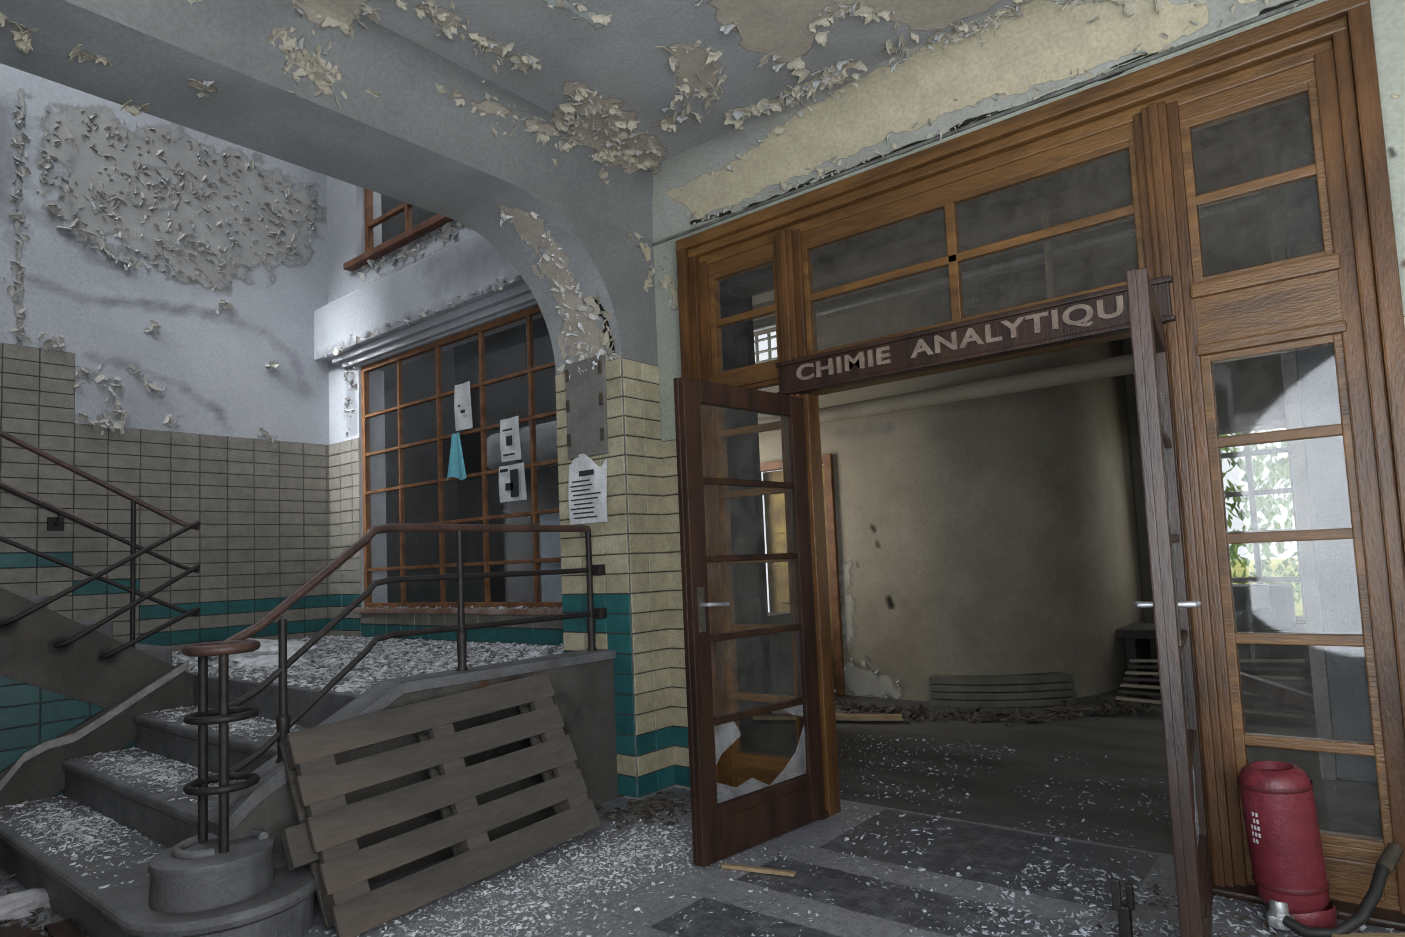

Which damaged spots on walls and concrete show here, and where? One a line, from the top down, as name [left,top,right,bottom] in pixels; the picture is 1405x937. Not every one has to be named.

peeling [0,12,37,53]
peeling [68,44,111,69]
peeling [73,362,167,435]
peeling [3,89,326,351]
peeling [323,205,621,436]
peeling [268,0,1268,227]